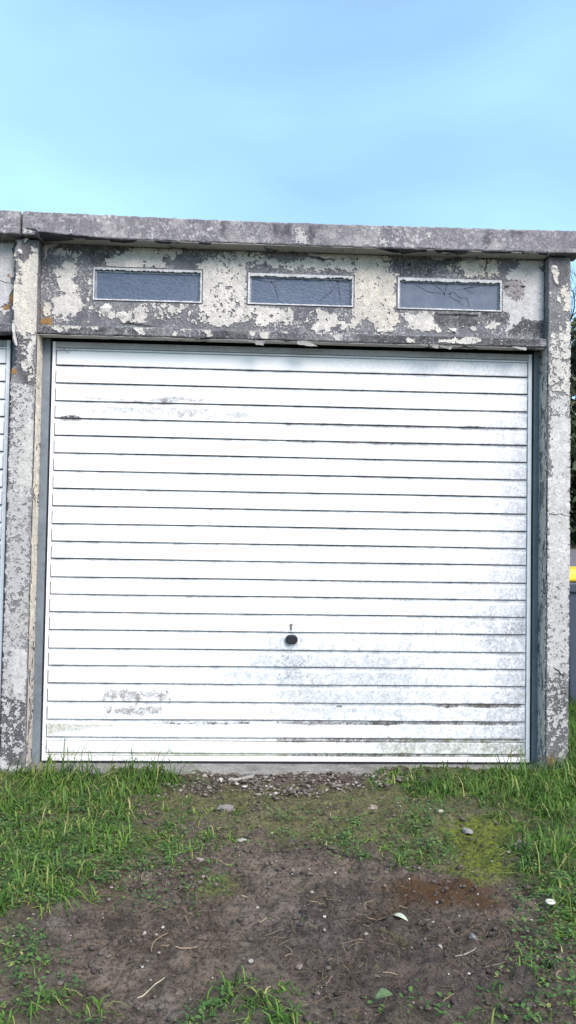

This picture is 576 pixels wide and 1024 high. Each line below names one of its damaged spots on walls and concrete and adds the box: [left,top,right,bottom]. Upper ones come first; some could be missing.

peeling [0,215,571,772]